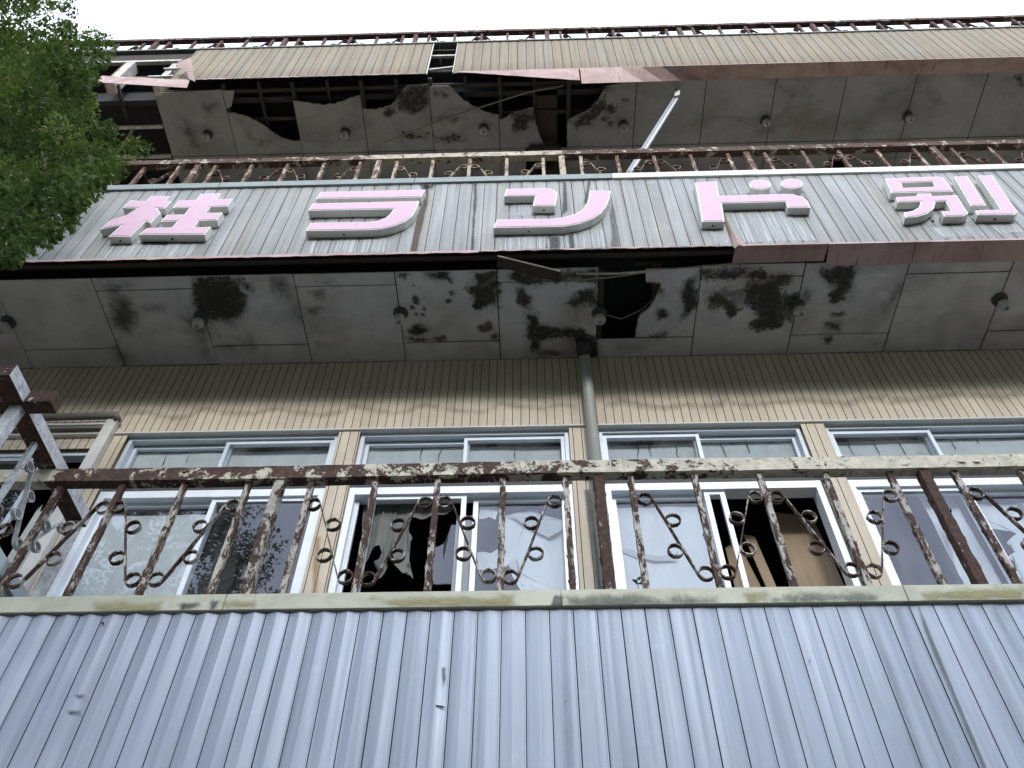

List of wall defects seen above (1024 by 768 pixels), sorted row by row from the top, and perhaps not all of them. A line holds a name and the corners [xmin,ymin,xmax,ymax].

damp [384,85,448,117]
damp [569,86,628,130]
damp [192,276,254,331]
damp [409,296,427,335]
damp [509,268,600,308]
damp [658,266,800,332]
damp [820,266,855,344]